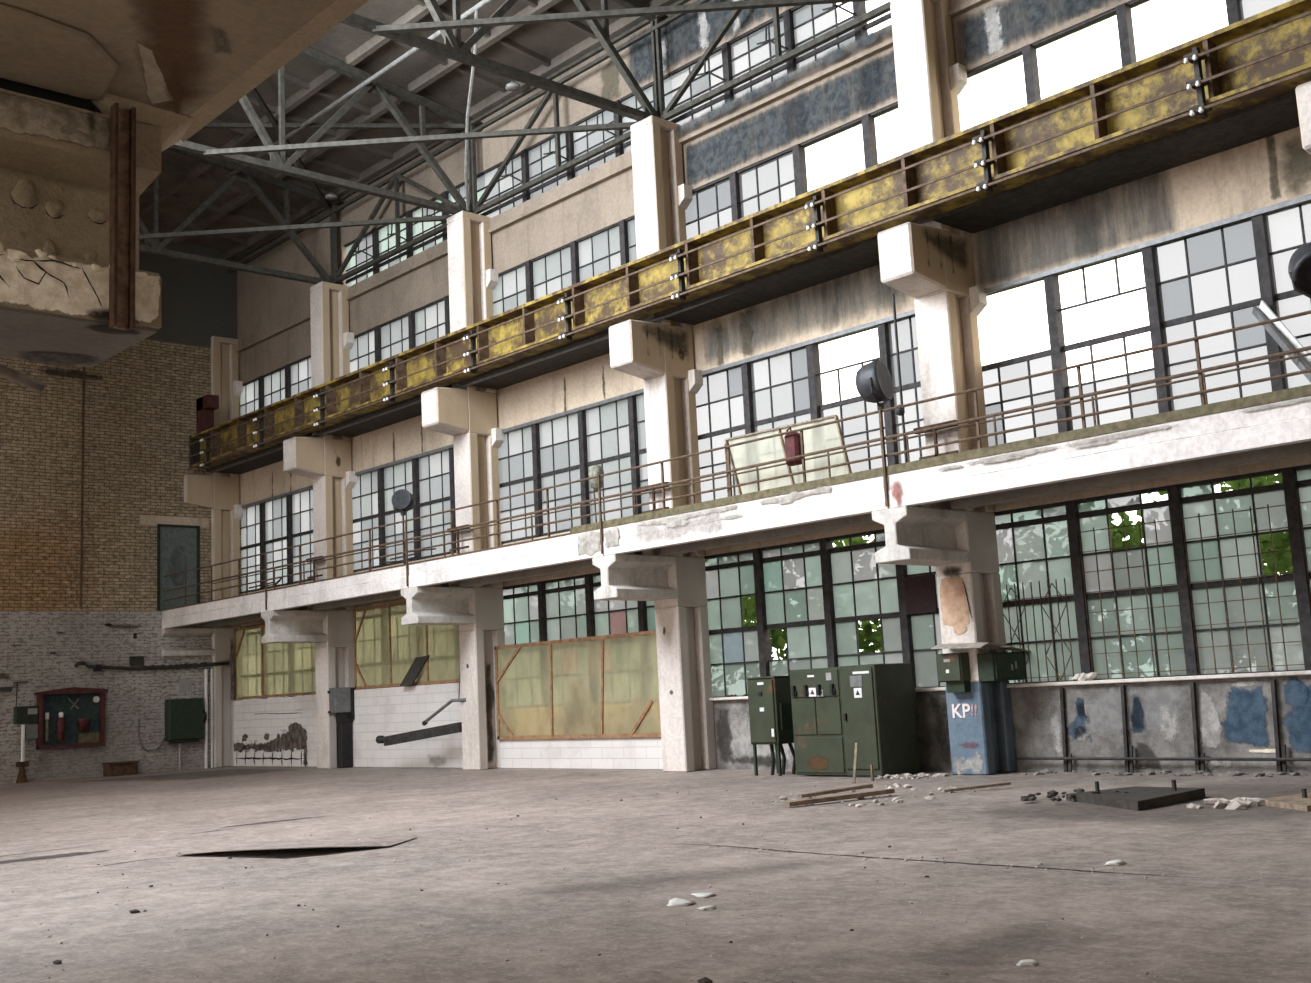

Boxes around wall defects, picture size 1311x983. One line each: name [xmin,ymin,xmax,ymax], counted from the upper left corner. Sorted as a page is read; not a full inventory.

spalling [0,91,110,150]
damp [677,23,897,185]
damp [1266,136,1311,199]
damp [925,171,1172,285]
crack [0,254,102,307]
peeling [0,242,110,316]
peeling [135,272,161,323]
peeling [940,578,969,635]
spalling [234,722,308,767]
peeling [1050,686,1183,755]
peeling [1200,681,1276,769]
peeling [1283,677,1311,753]